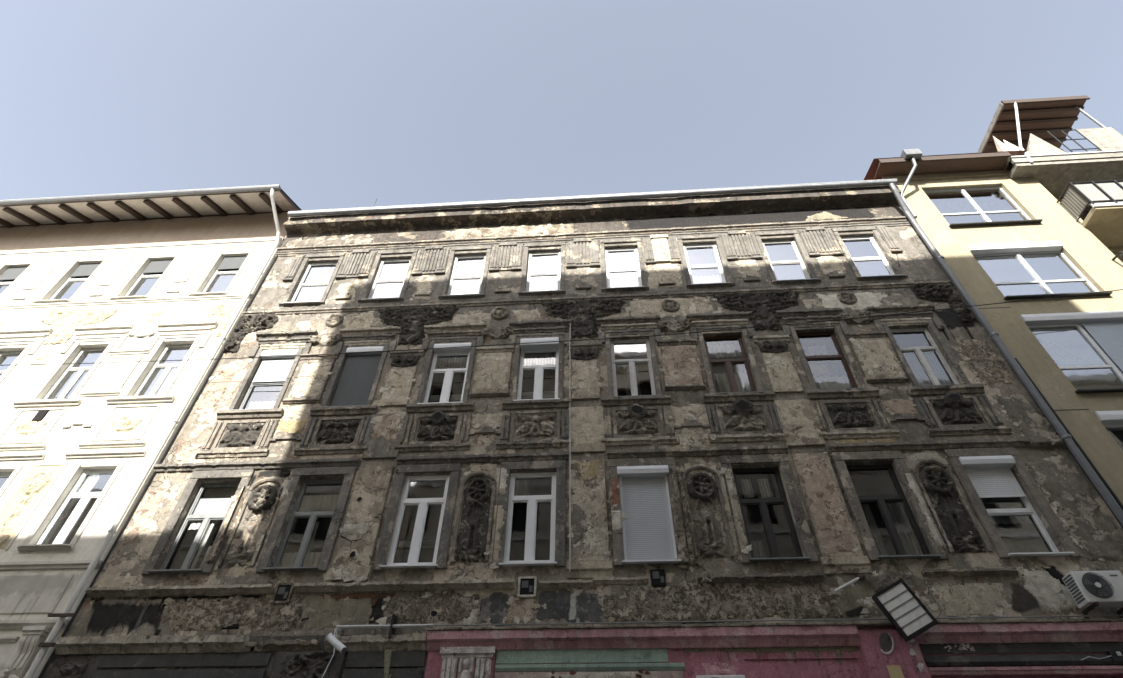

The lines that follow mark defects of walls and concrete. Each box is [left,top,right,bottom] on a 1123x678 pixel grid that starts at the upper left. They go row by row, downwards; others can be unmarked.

flaking render [992,394,1123,562]
flaking render [121,490,171,546]
flaking render [207,486,250,563]
flaking render [338,492,376,535]
flaking render [572,404,883,624]
flaking render [92,573,144,588]
flaking render [225,529,271,578]
flaking render [324,550,370,582]
flaking render [164,591,559,635]